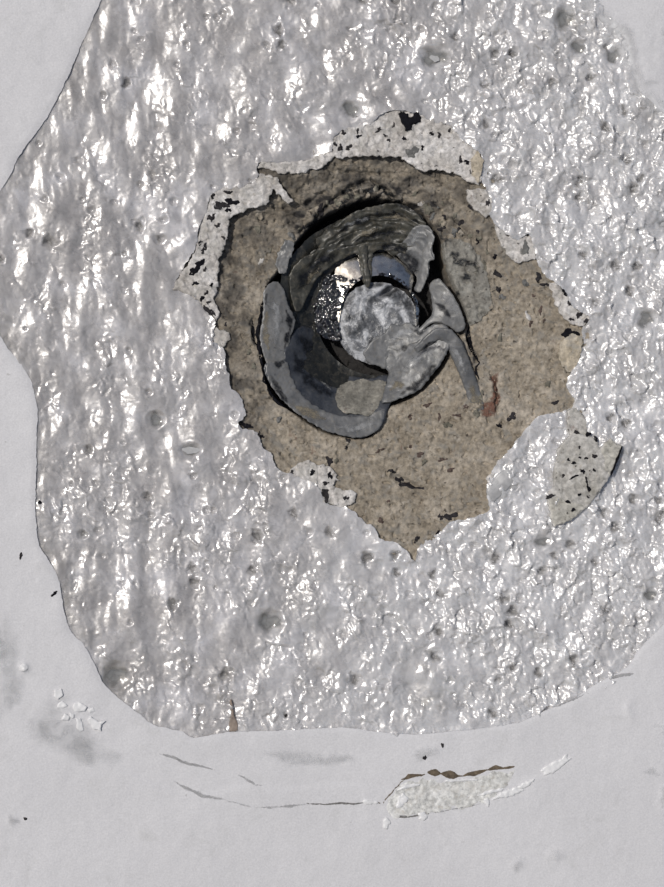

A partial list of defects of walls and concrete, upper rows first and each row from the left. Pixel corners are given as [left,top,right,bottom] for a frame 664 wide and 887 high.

spalling [173,110,589,561]
rust [482,375,500,417]
peeling [546,408,623,527]
peeling [54,689,105,731]
crack [163,754,220,799]
crack [263,765,515,808]
peeling [363,754,571,829]